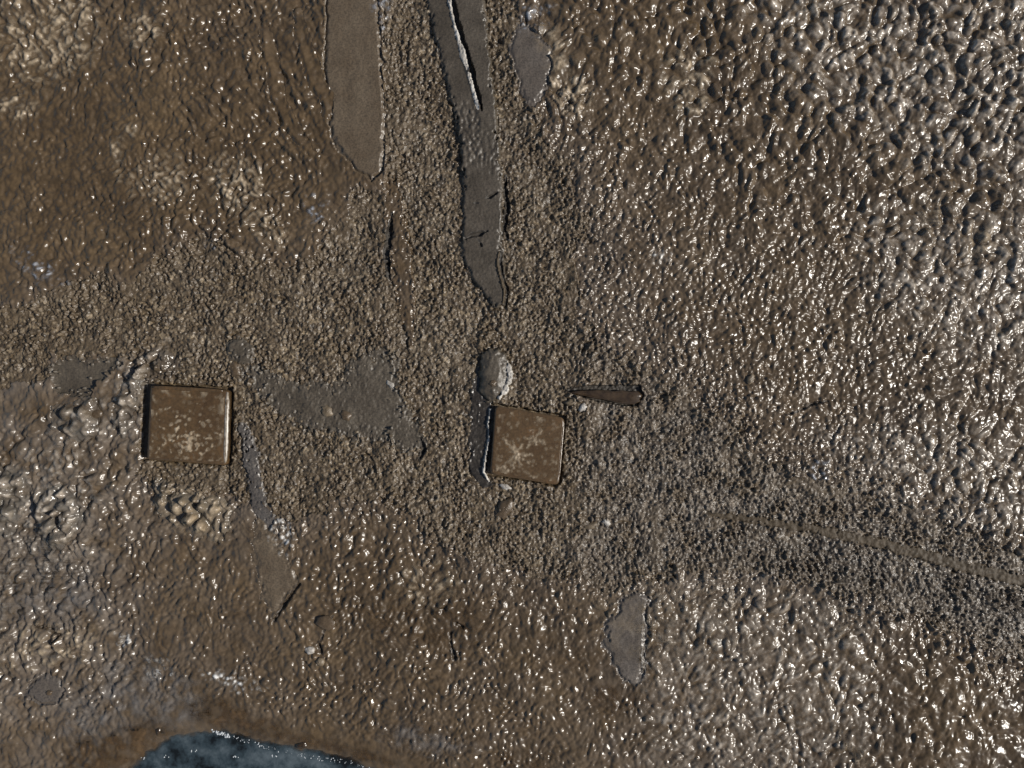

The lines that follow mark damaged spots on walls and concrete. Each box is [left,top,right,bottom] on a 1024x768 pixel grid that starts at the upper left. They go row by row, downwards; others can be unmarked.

crack [447,0,483,111]
spalling [0,0,596,581]
crack [463,174,511,306]
spalling [561,335,1024,666]
peeling [601,590,653,686]